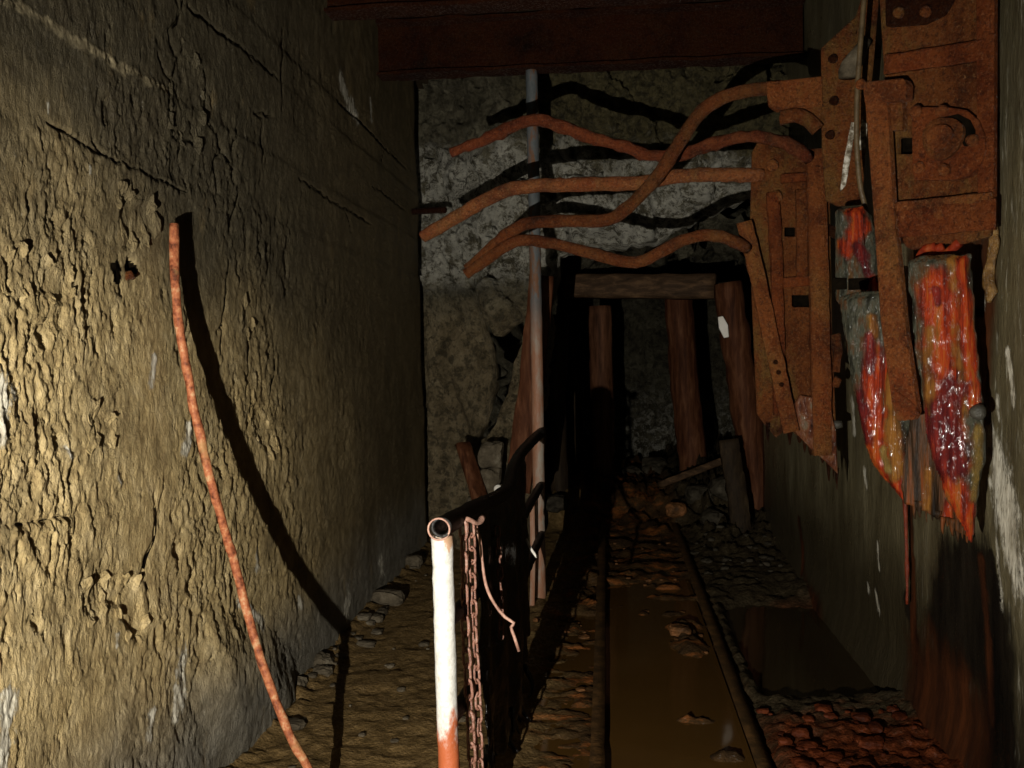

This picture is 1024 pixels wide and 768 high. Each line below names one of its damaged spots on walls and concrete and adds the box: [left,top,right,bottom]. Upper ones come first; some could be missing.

crack [46,0,283,227]
corrosion [908,289,923,406]
corrosion [952,238,994,425]
damp [904,255,1024,768]